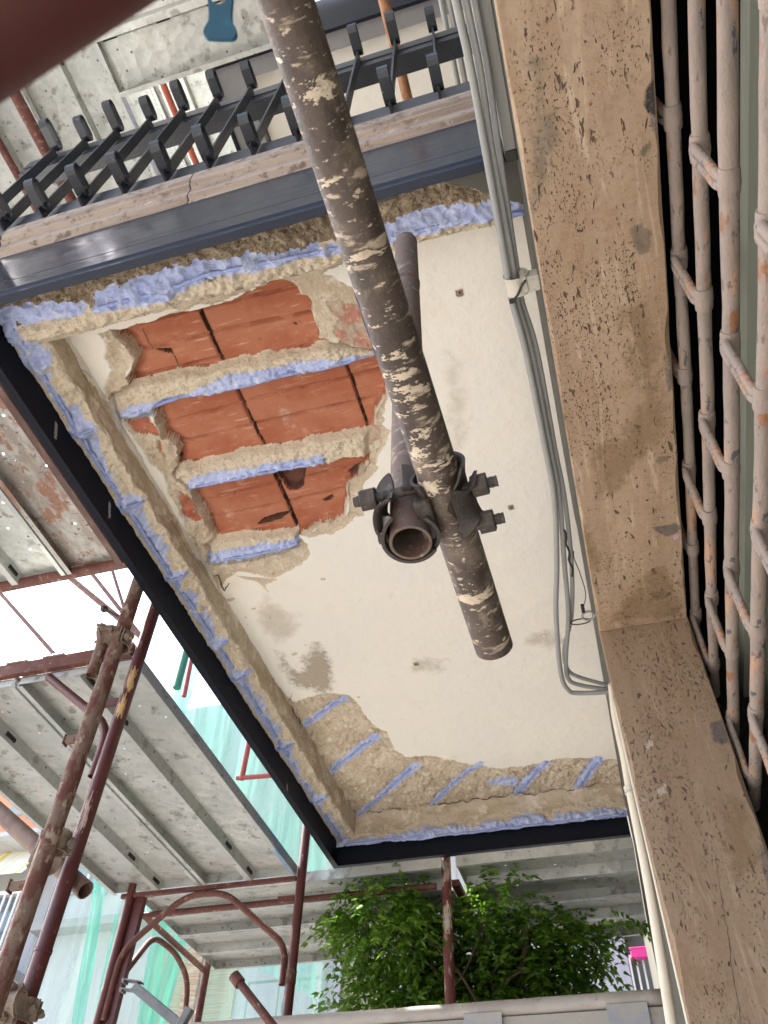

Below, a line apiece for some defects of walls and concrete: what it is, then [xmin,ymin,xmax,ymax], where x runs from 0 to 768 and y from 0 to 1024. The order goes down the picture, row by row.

spalling [378,182,491,224]
spalling [0,214,626,847]
damp [291,652,329,691]